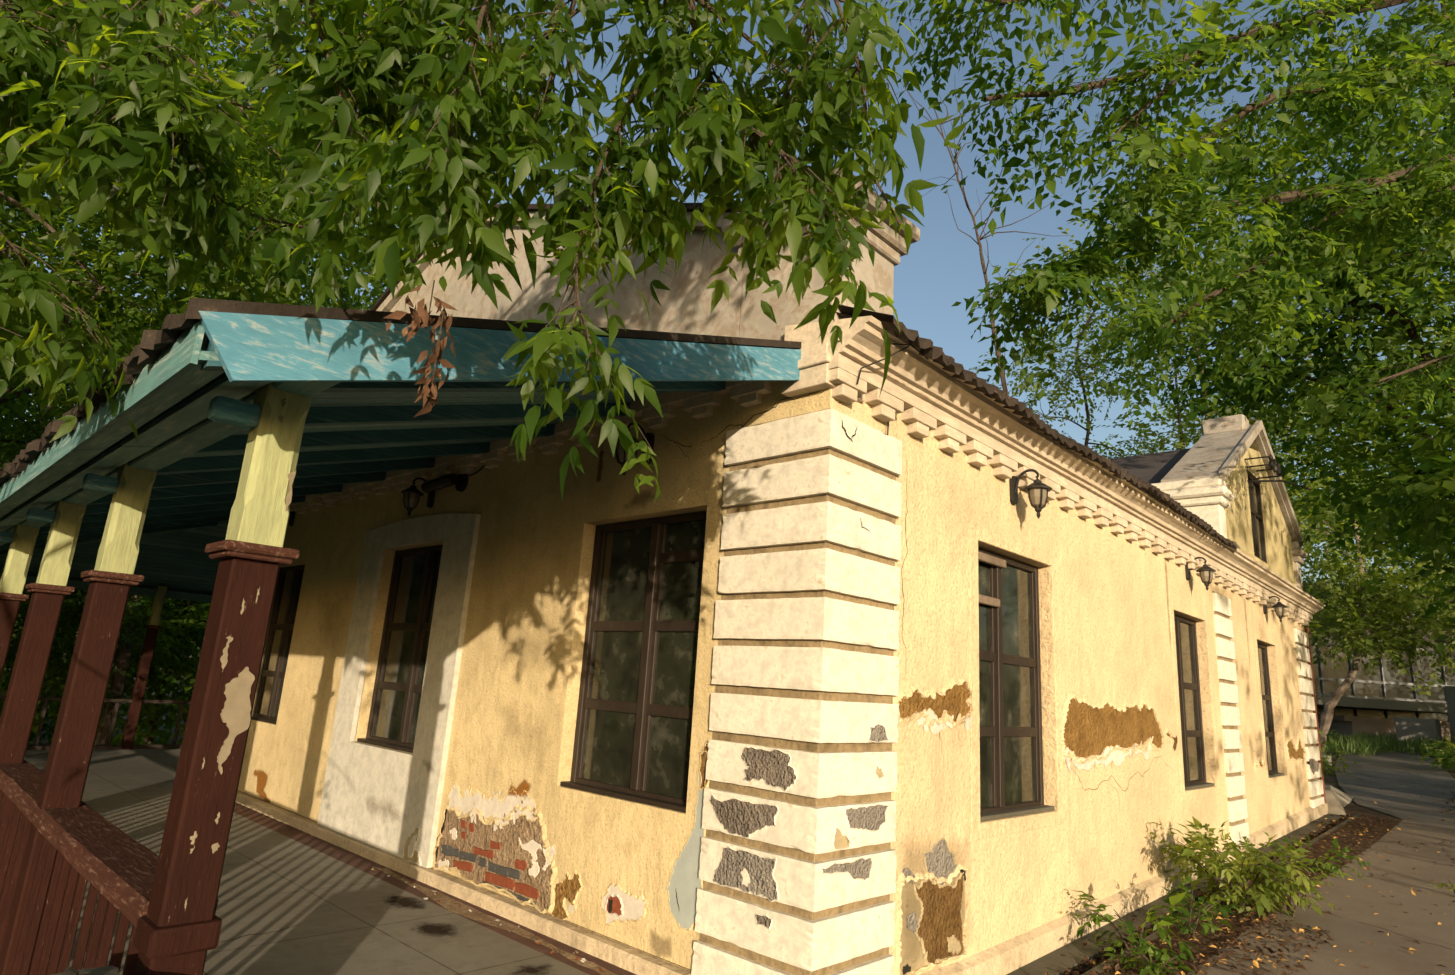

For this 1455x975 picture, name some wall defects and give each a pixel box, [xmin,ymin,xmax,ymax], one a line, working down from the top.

peeling [202,636,256,776]
peeling [868,676,973,743]
peeling [1062,693,1178,772]
peeling [1286,737,1319,775]
peeling [190,831,220,854]
flaking render [402,783,584,921]
peeling [666,741,798,931]
peeling [821,803,889,881]
peeling [601,883,649,926]
flaking render [895,837,969,975]